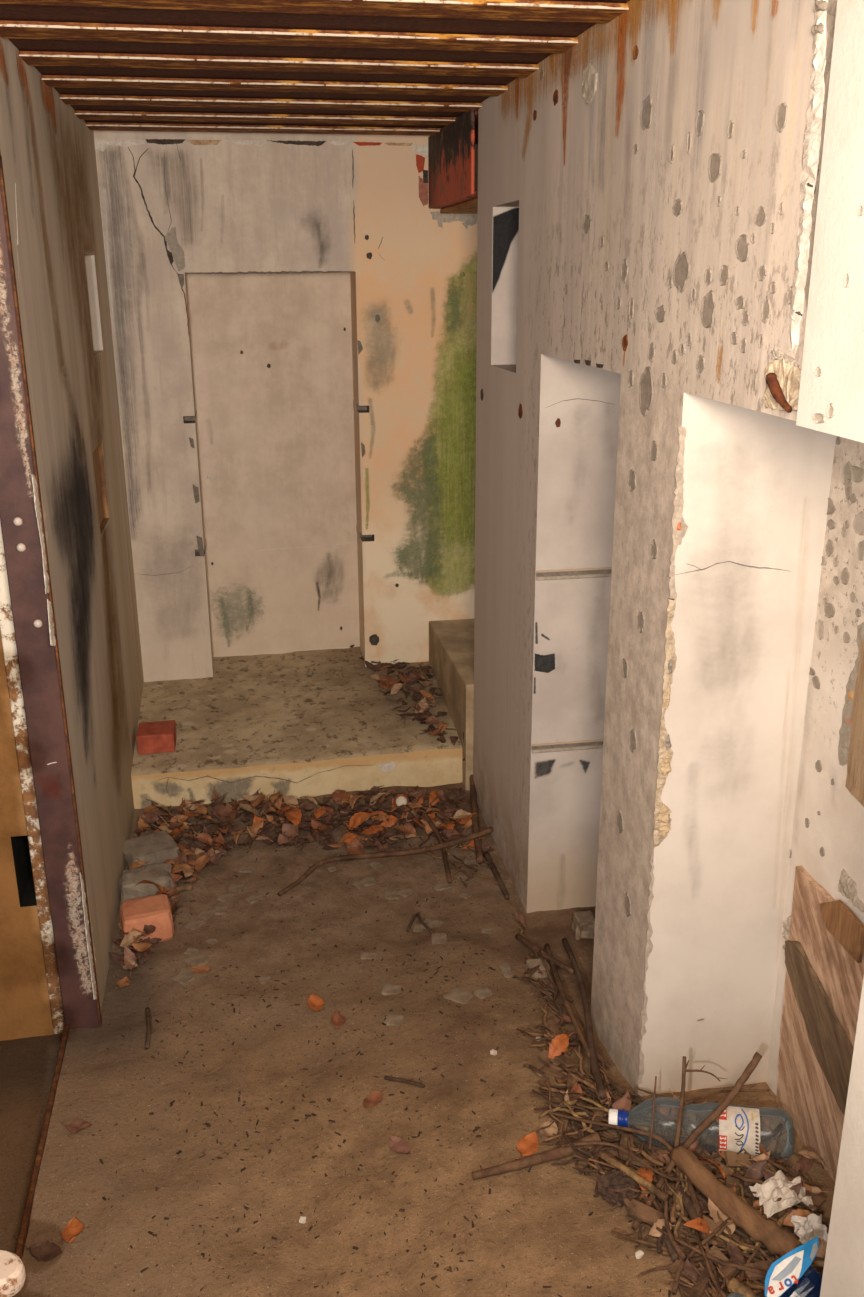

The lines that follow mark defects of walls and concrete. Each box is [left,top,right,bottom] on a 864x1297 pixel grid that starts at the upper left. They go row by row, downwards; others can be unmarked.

corrosion [0,41,57,132]
corrosion [502,0,678,165]
crack [128,146,189,335]
flaking render [582,0,837,417]
spalling [813,403,836,423]
spalling [628,469,636,492]
crack [676,561,791,575]
flaking render [815,461,864,785]
spalling [809,667,820,689]
spalling [636,426,688,1084]
flaking render [838,868,864,912]